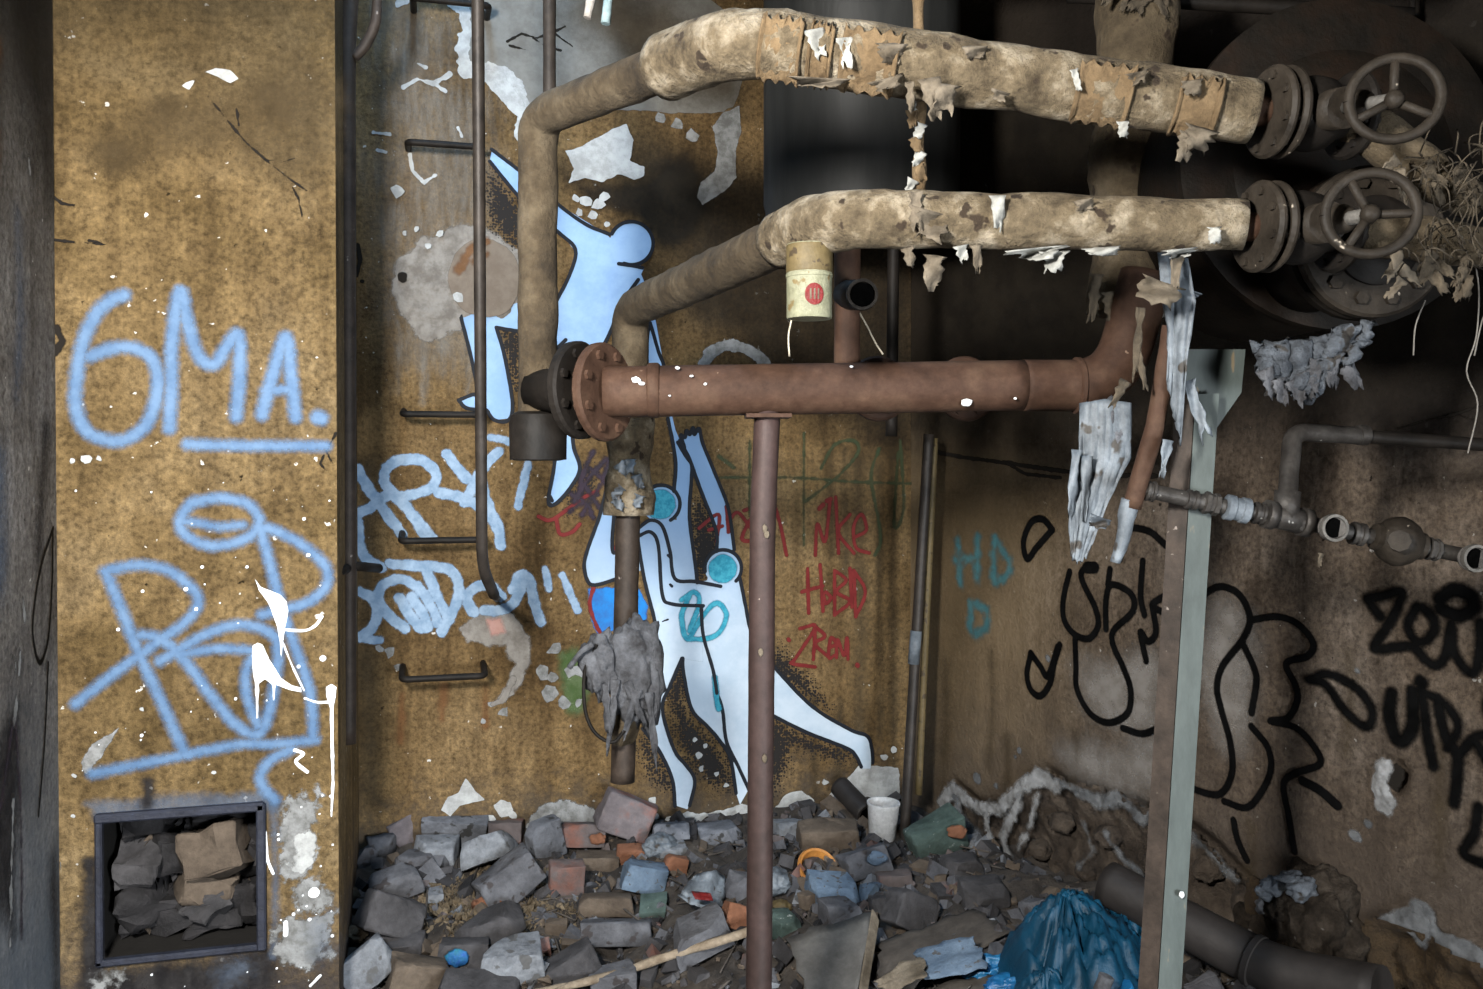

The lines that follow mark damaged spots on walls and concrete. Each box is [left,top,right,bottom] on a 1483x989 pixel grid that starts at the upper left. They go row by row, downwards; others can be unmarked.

peeling [447,0,723,141]